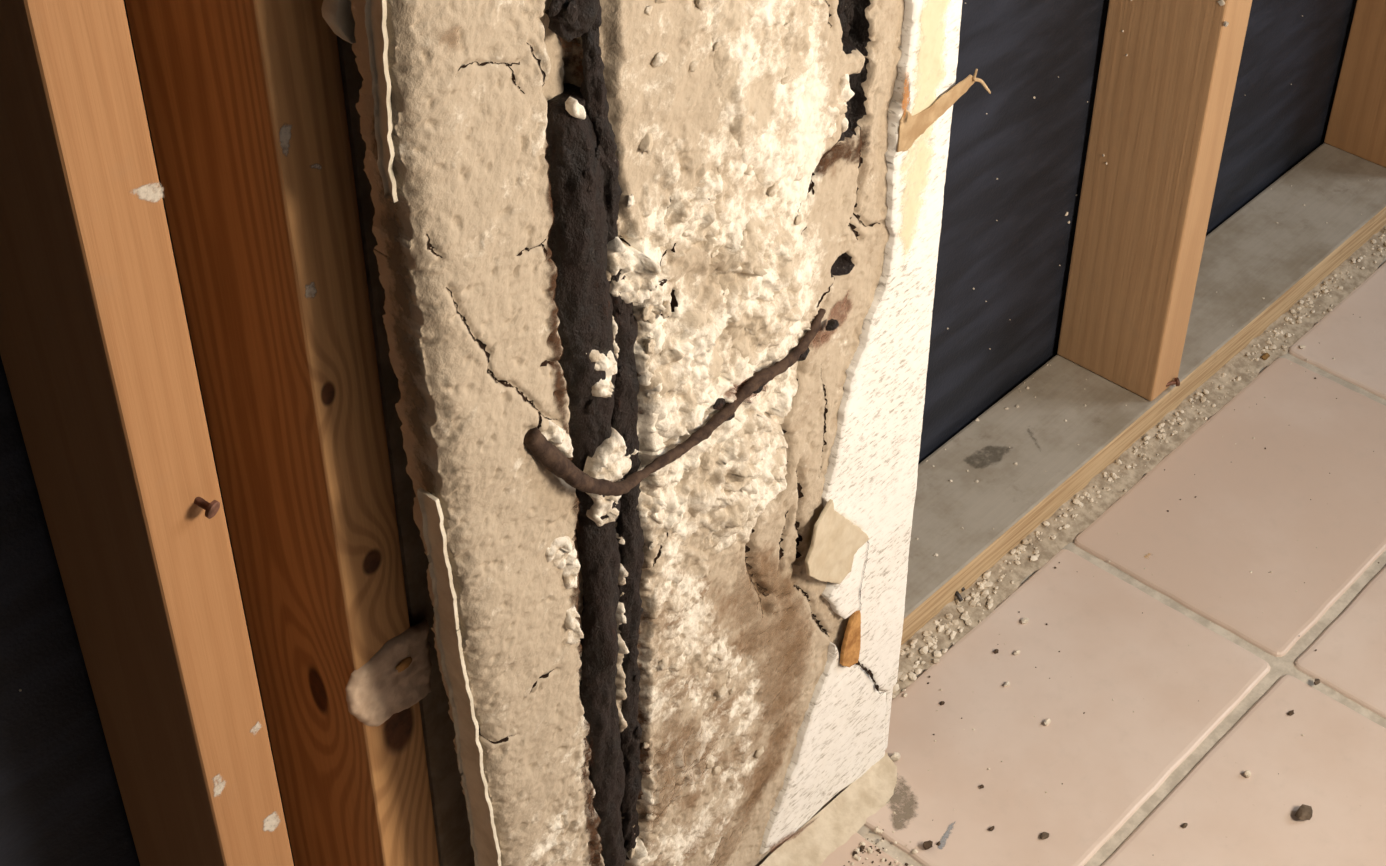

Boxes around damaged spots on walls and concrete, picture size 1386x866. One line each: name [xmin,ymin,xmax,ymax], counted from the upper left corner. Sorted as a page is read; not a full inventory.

crack [455,42,546,94]
crack [426,233,558,429]
spalling [321,0,991,866]
crack [745,367,828,635]
crack [845,661,886,694]